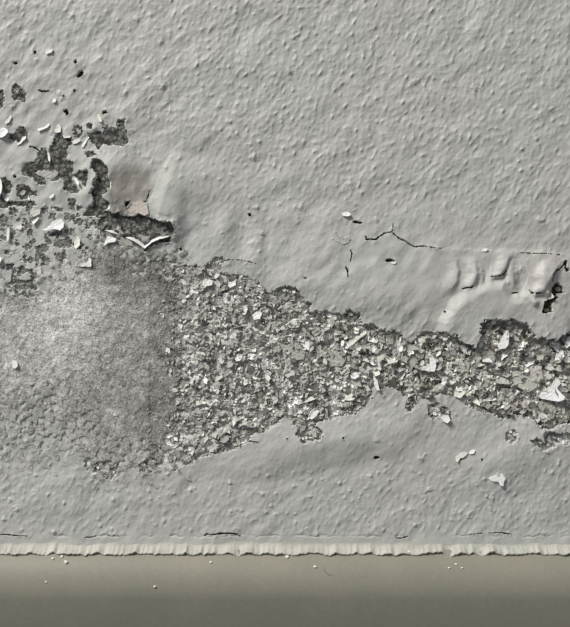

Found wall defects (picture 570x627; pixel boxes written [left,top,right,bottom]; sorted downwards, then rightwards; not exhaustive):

peeling [0,84,27,108]
peeling [0,111,175,302]
crack [353,221,431,248]
damp [0,215,206,493]
spalling [140,257,570,476]
spalling [85,458,119,480]